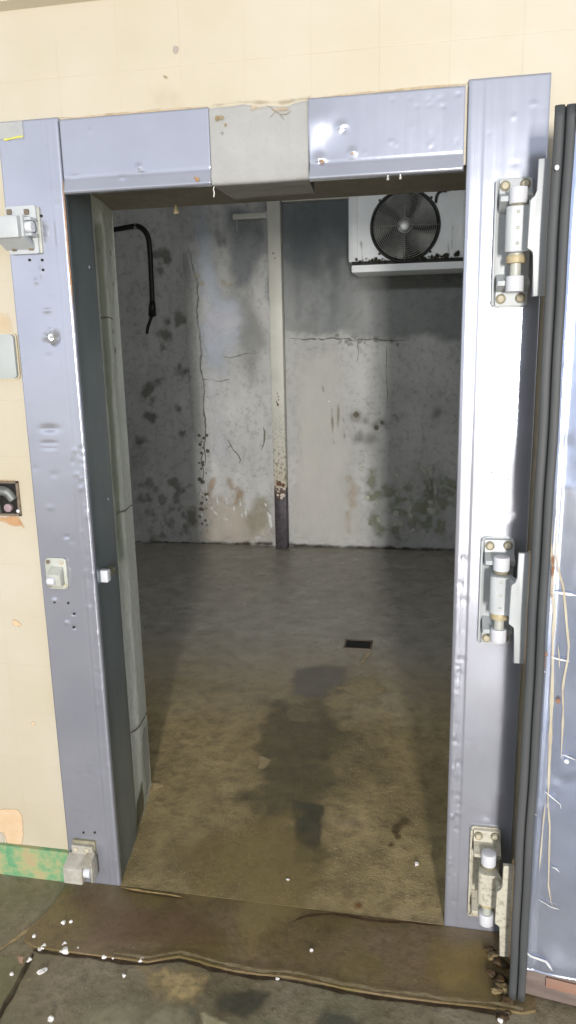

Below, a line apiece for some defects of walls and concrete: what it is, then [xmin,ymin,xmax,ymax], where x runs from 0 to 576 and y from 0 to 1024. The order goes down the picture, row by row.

crack [188,248,265,484]
crack [290,337,402,403]
water stain [289,356,456,551]
peeling [0,809,23,845]
water stain [244,667,342,864]